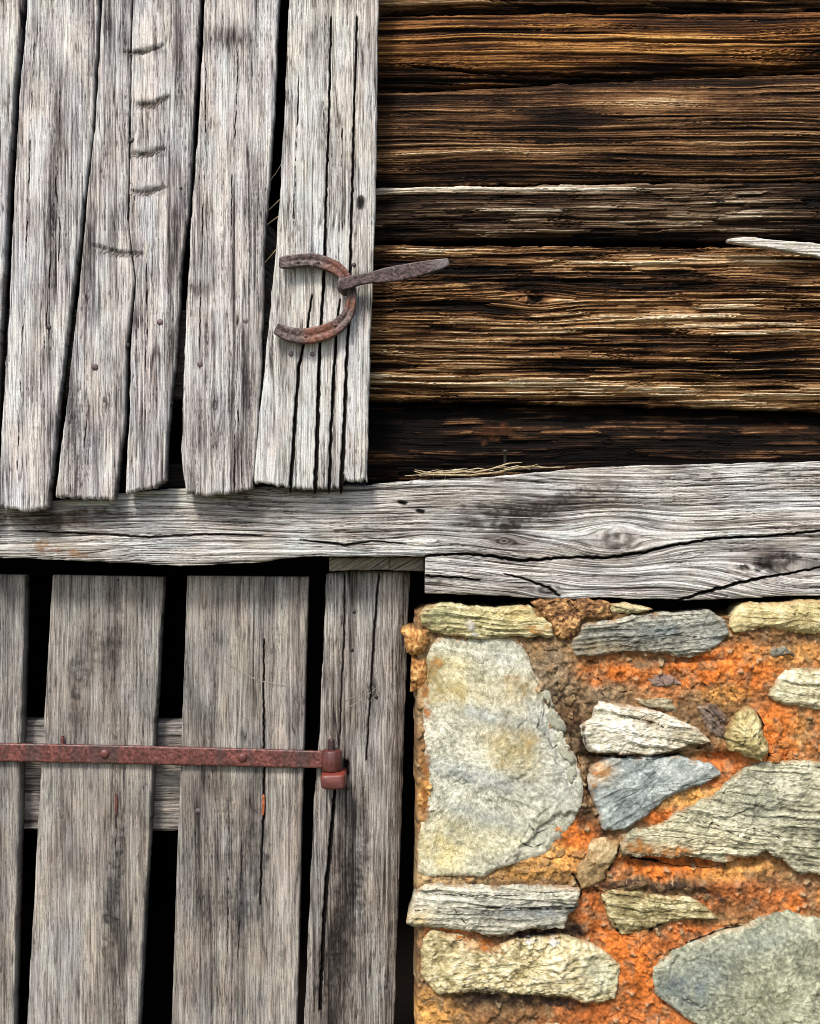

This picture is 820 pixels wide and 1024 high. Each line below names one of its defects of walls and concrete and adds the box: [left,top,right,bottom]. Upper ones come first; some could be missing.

crack [289,20,358,494]
crack [24,530,258,538]
crack [303,539,403,547]
crack [426,530,820,601]
crack [366,576,379,759]
crack [225,642,265,971]
crack [319,789,336,1010]